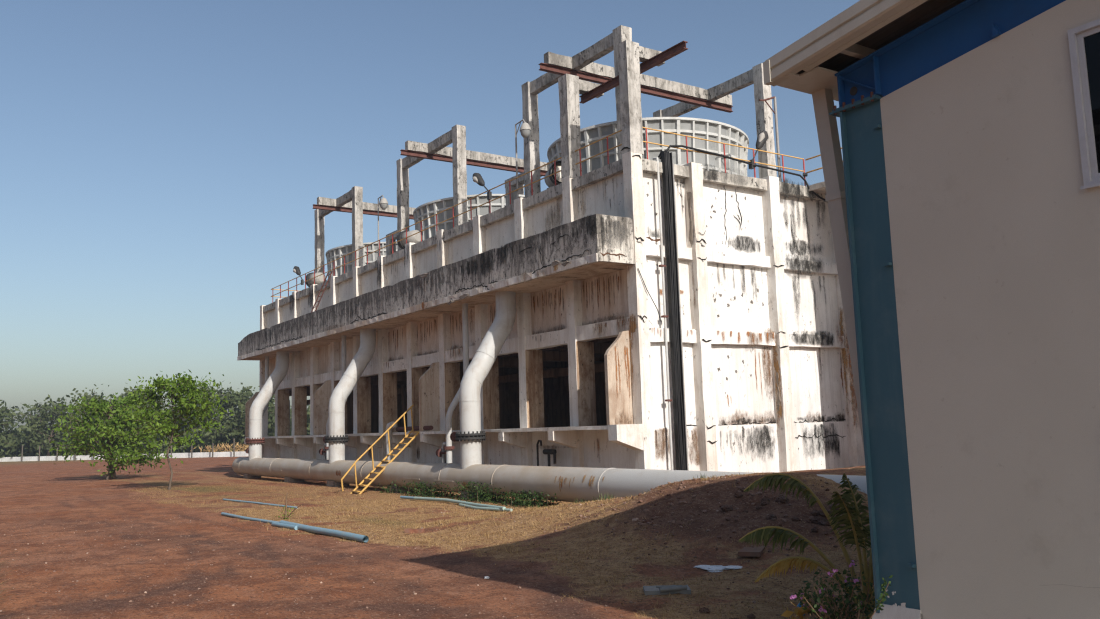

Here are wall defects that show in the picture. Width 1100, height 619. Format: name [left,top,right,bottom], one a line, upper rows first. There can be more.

water stain [454,243,539,281]
water stain [573,204,625,247]
water stain [781,179,826,315]
corrosion [531,260,636,397]
corrosion [717,328,782,425]
corrosion [838,311,857,425]
water stain [720,418,775,456]